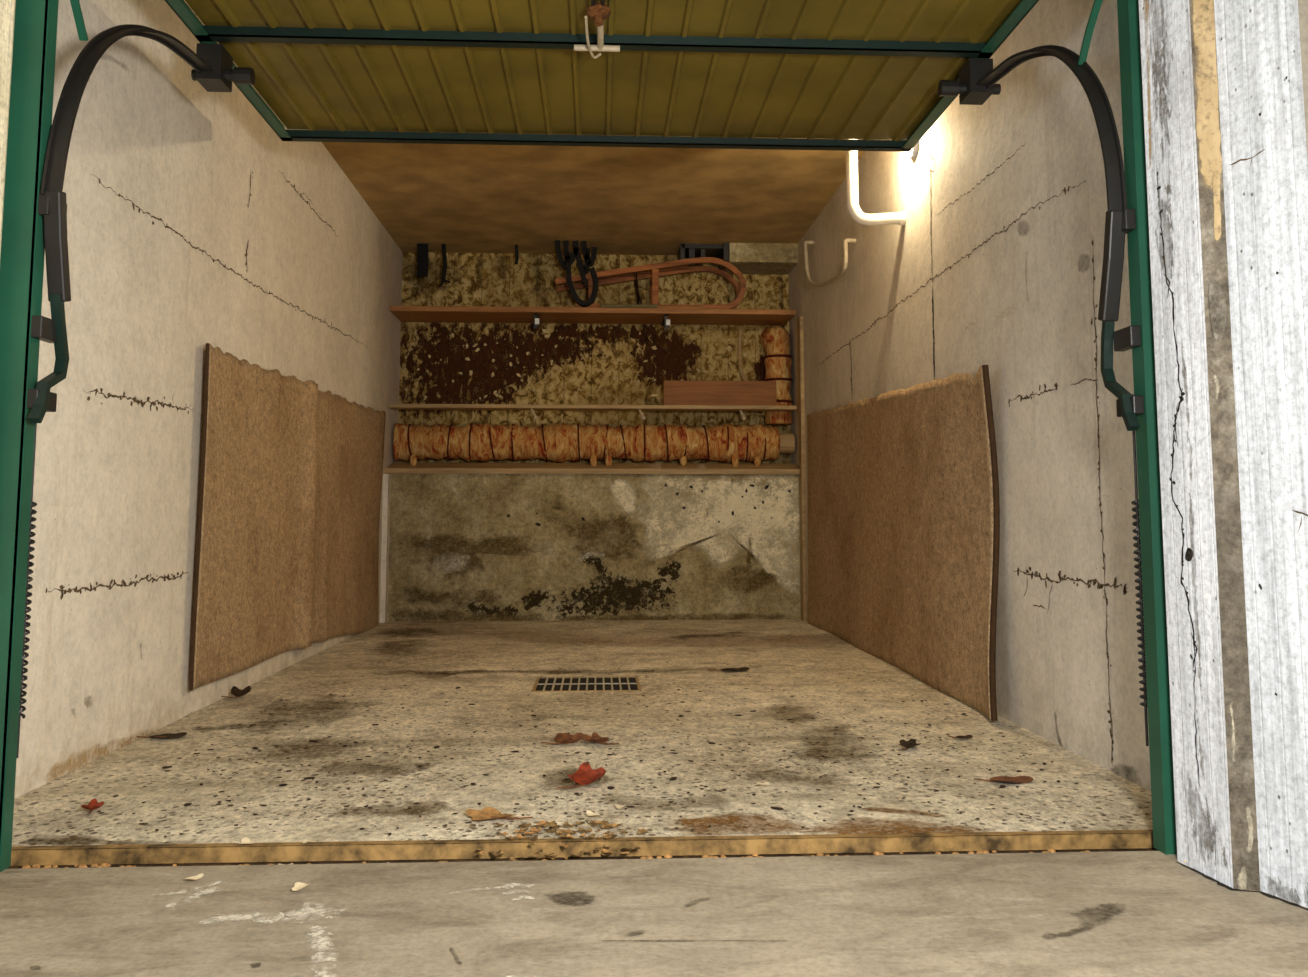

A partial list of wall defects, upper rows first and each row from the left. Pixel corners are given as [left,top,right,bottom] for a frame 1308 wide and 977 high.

crack [1157,172,1201,790]
damp [378,515,784,654]
damp [399,669,682,677]